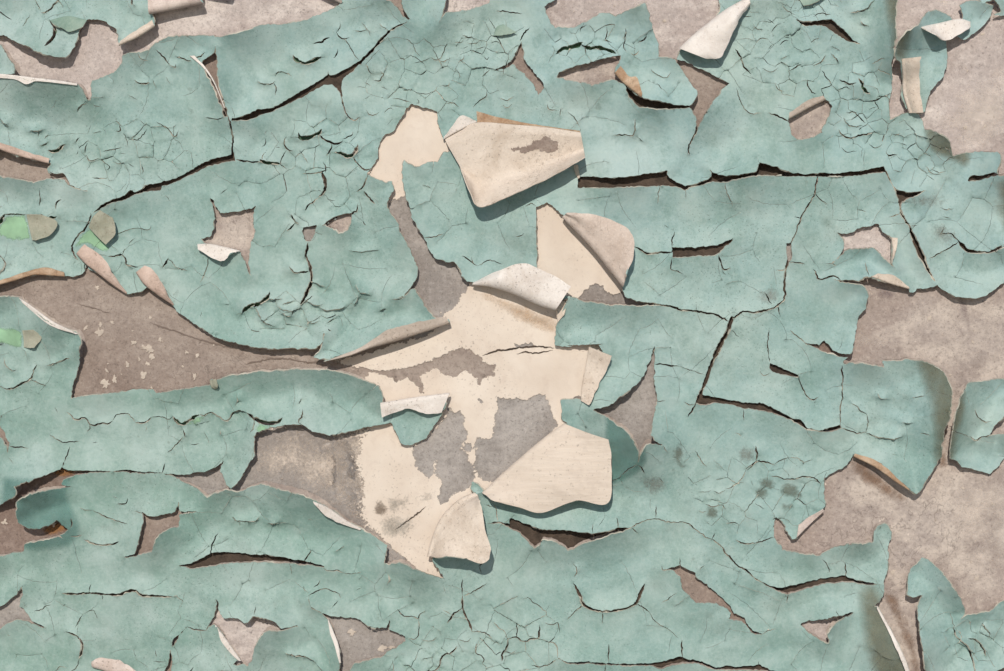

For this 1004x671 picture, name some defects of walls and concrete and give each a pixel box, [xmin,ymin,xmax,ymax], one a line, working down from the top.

crack [553,24,646,56]
peeling [0,44,450,362]
crack [72,10,529,304]
crack [578,0,995,435]
crack [243,293,270,312]
peeling [0,174,953,671]
crack [483,345,552,356]
peeling [773,0,1004,671]
crack [40,589,167,668]
crack [183,535,320,595]
crack [448,518,774,671]
crack [771,562,871,597]